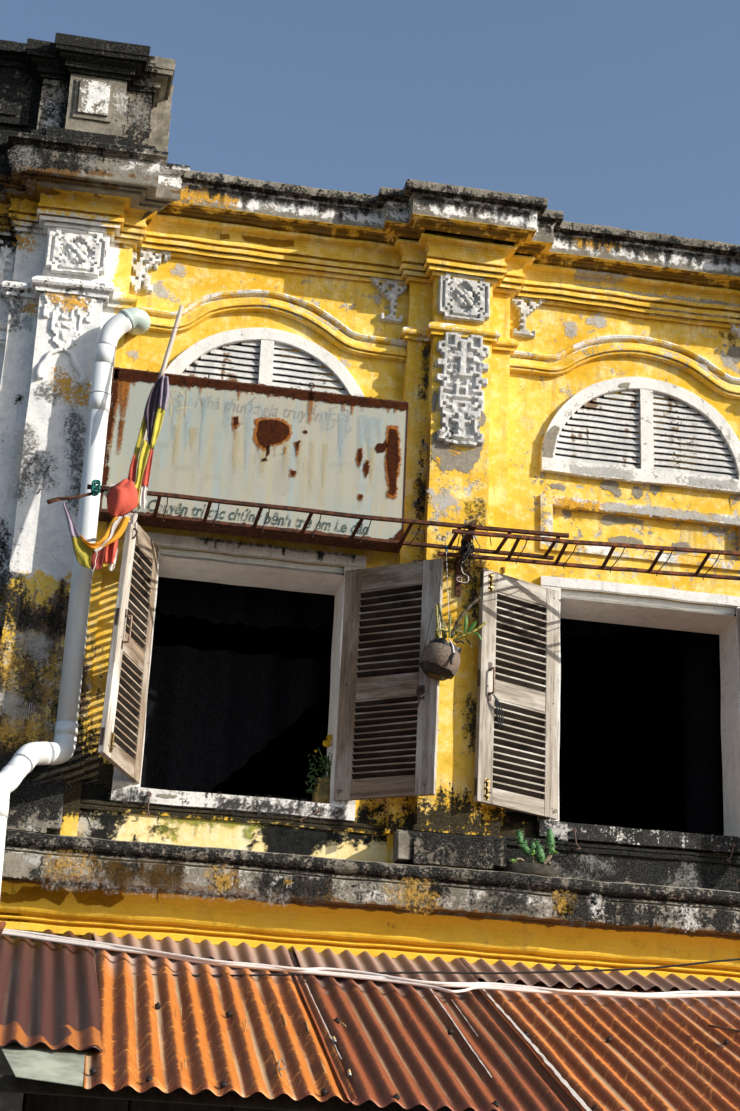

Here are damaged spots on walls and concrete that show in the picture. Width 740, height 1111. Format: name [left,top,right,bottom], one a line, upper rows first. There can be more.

leakage [189,185,373,221]
leakage [418,196,530,229]
peeling [21,292,88,318]
peeling [51,366,91,406]
rust [101,367,409,499]
peeling [600,480,661,498]
peeling [601,515,644,545]
peeling [708,527,729,537]
leakage [194,792,387,856]
leakage [503,808,572,840]
leakage [0,854,187,923]
rust [0,1021,105,1052]